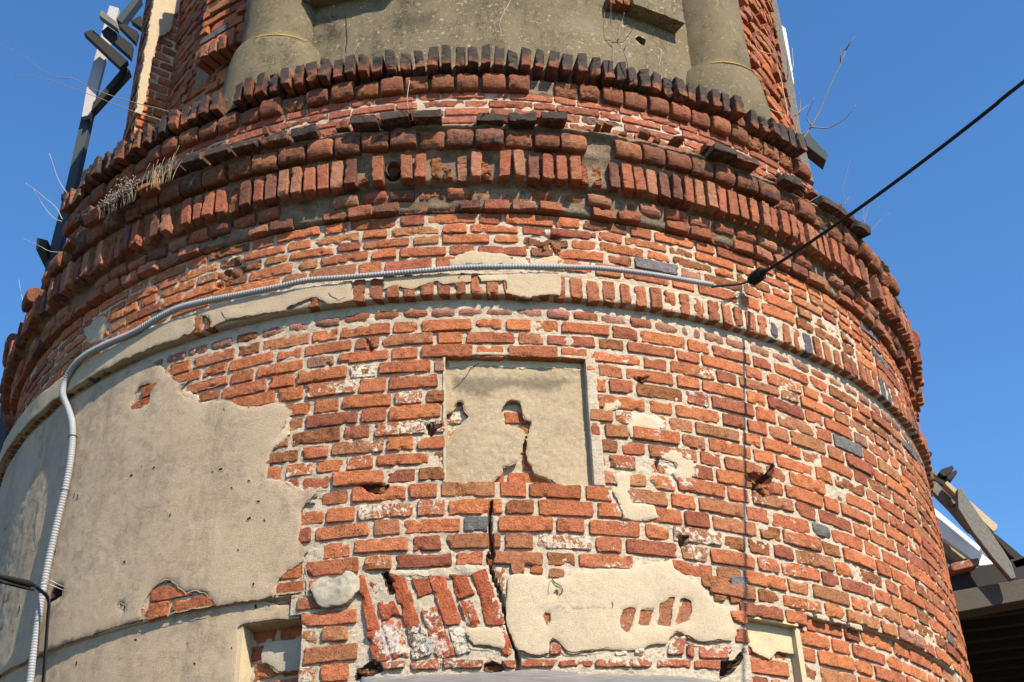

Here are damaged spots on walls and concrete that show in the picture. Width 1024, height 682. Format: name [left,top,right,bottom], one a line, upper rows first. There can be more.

peeling [116,361,315,504]
hole [360,484,389,494]
flaking render [492,400,582,515]
flaking render [271,561,310,597]
crack [465,506,607,670]
flaking render [620,598,692,633]